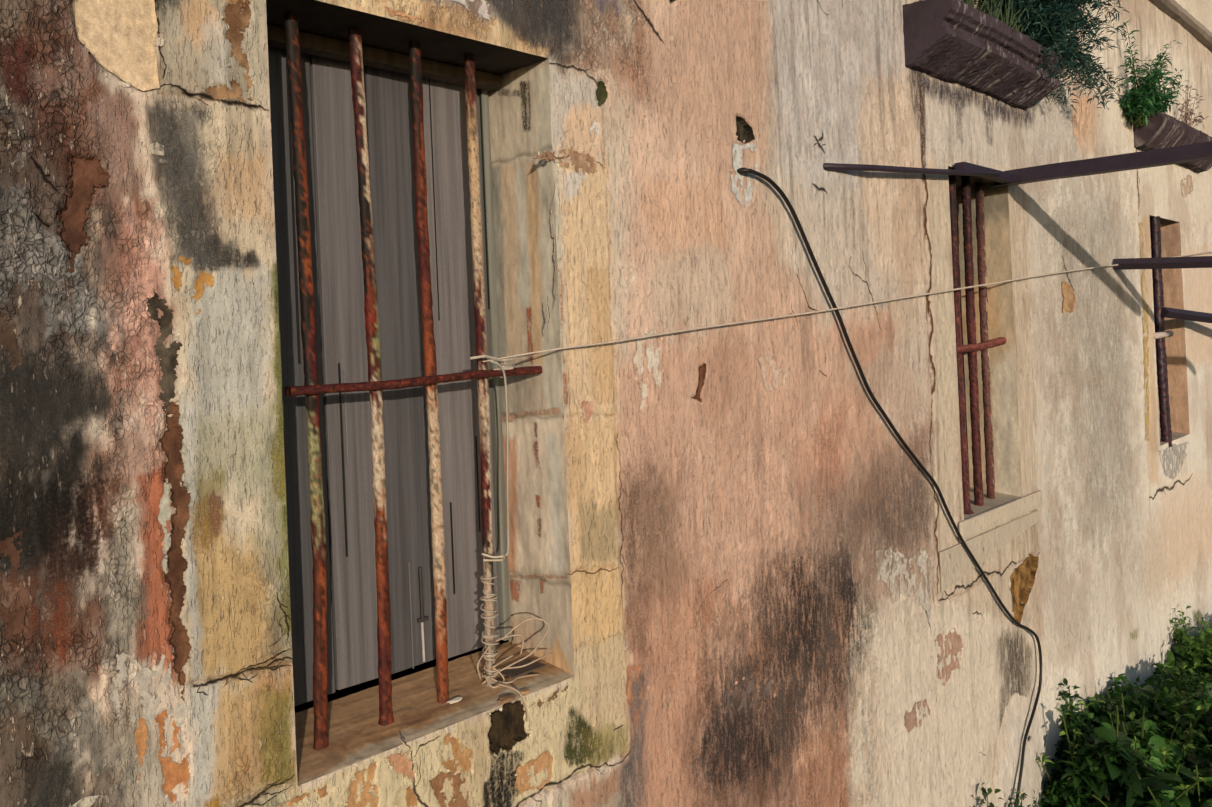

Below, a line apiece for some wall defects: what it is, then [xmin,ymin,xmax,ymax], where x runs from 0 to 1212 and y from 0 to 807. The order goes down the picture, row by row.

crack [120,0,269,111]
damp [151,106,257,271]
damp [0,354,100,568]
flaking render [108,254,214,803]
corrosion [502,356,568,462]
crack [919,77,1040,634]
crack [1149,473,1193,500]
corrosion [510,575,564,601]
damp [691,428,928,789]
spalling [1009,554,1039,624]
peeling [275,733,474,807]
spalling [488,685,569,756]